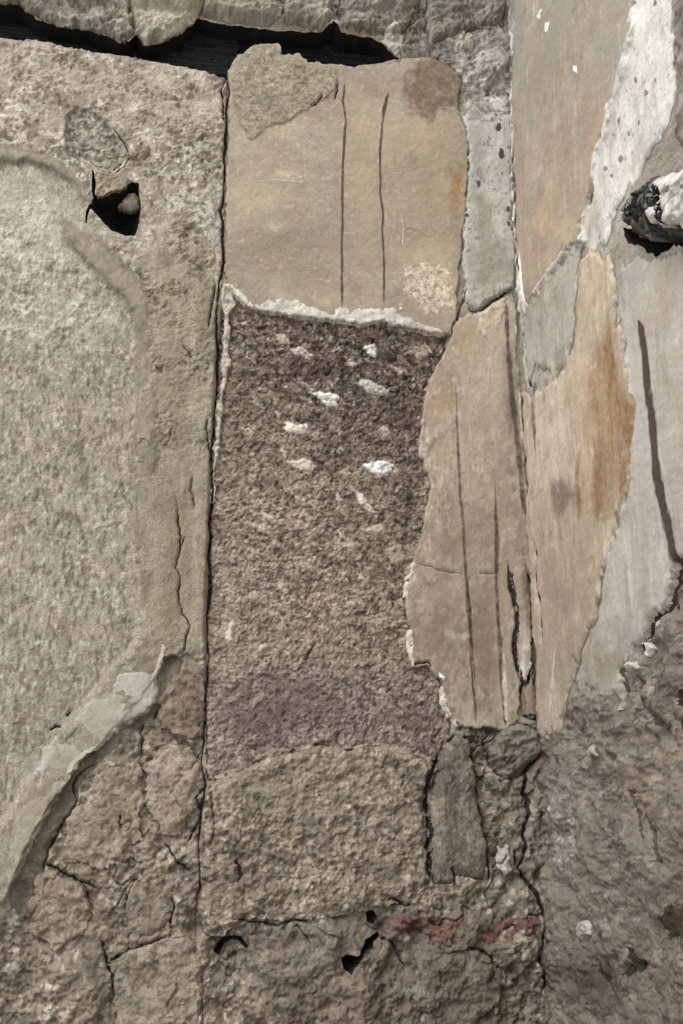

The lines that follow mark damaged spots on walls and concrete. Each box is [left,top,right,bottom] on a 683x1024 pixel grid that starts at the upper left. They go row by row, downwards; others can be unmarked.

leakage [409,58,461,118]
crack [100,79,230,992]
crack [419,540,543,720]
crack [40,764,96,909]
flaking render [4,644,183,933]
crack [198,979,206,1024]
crack [234,919,311,944]
crack [423,736,490,885]
crack [468,947,507,983]
crack [514,753,547,1000]